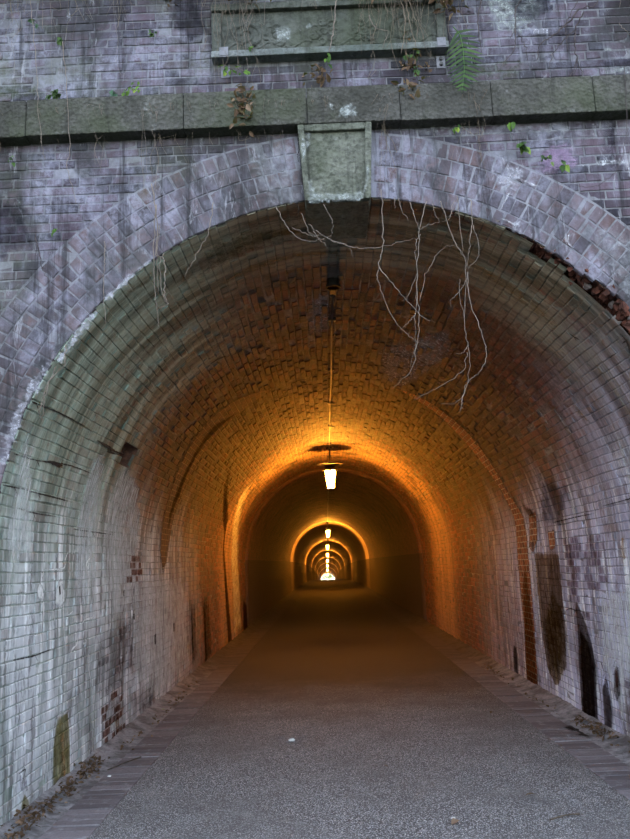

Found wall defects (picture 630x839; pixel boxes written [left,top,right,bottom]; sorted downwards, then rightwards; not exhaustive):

spalling [495,219,630,336]
damp [535,554,630,728]
damp [54,715,70,785]